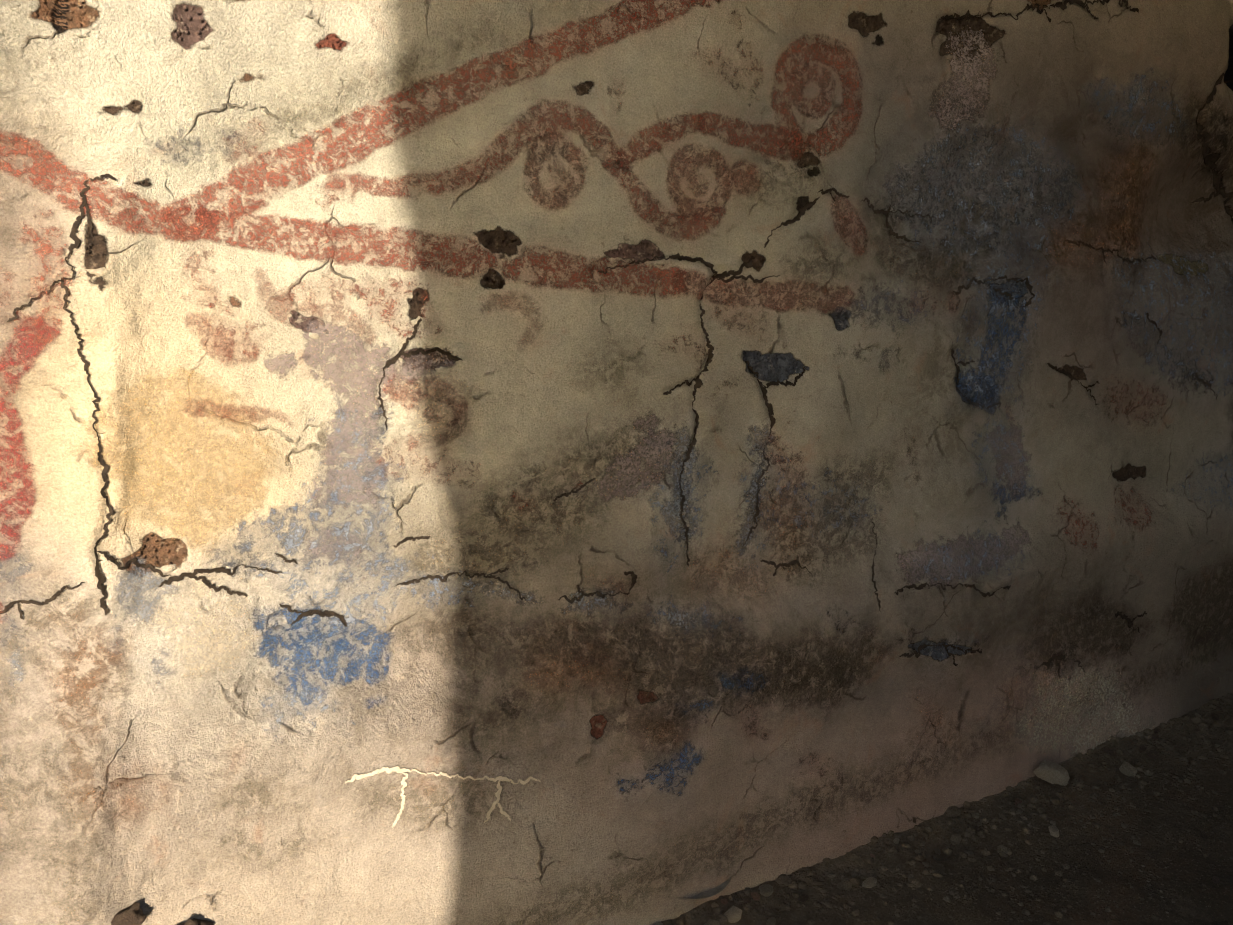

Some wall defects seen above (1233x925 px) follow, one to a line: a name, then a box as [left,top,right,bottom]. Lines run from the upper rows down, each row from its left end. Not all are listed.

spalling [30,0,100,37]
spalling [171,3,214,50]
crack [941,0,1139,22]
crack [0,174,297,620]
crack [598,188,932,576]
spalling [743,350,810,388]
spalling [121,532,188,577]
crack [393,536,431,548]
crack [394,568,526,601]
crack [558,571,637,604]
crack [279,604,347,627]
crack [345,766,541,829]